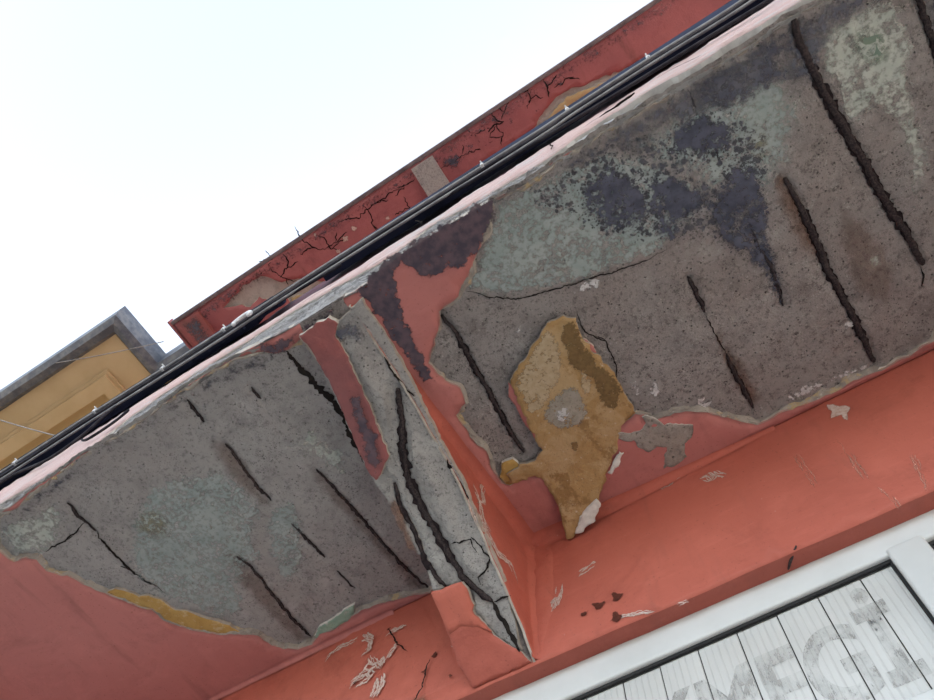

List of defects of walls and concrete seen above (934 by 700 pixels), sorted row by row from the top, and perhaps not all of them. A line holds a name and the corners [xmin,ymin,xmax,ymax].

crack [442,75,579,168]
crack [600,93,635,117]
crack [259,179,422,286]
crack [467,250,665,300]
damp [357,0,925,382]
spalling [416,0,934,540]
spalling [0,245,523,650]
crack [286,351,364,463]
crack [451,537,520,652]
crack [414,660,430,700]